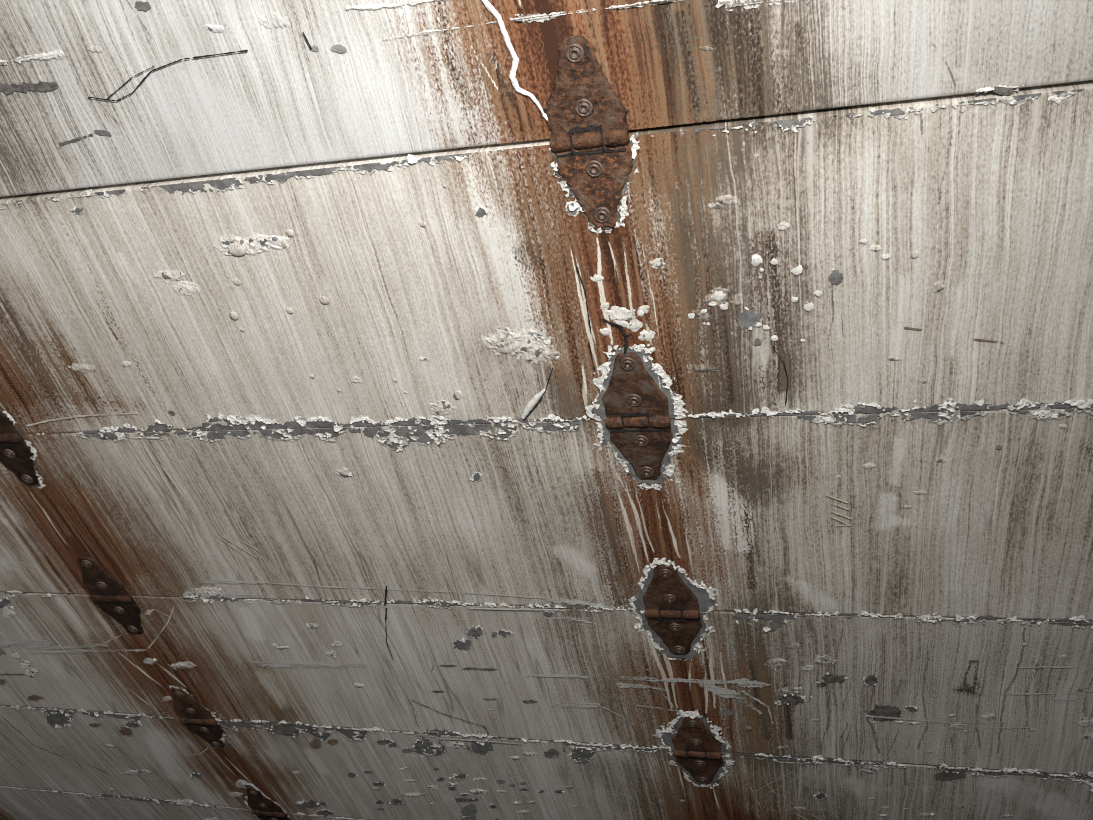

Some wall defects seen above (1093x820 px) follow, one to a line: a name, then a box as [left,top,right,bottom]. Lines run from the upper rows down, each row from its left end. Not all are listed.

crack [88,50,248,101]
peeling [833,85,1093,119]
peeling [140,152,478,194]
peeling [549,135,654,234]
rust [398,0,730,599]
peeling [76,302,1093,490]
peeling [0,409,46,489]
rust [0,318,314,820]
peeling [177,558,719,661]
peeling [733,608,1093,632]
peeling [162,685,906,820]
rust [609,617,828,820]